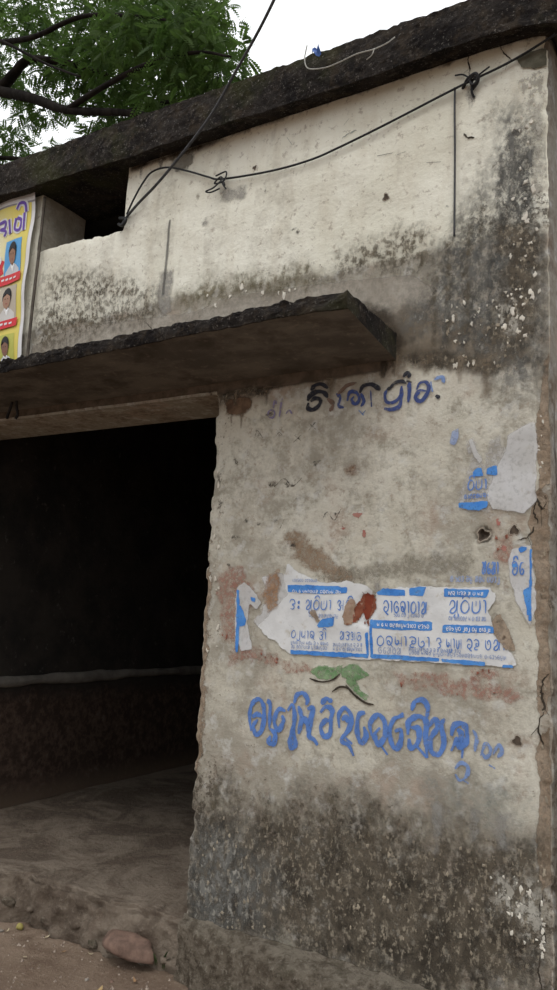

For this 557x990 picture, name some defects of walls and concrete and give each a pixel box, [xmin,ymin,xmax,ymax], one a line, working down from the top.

leakage [0,113,547,419]
crack [531,674,549,747]
leakage [188,783,557,990]